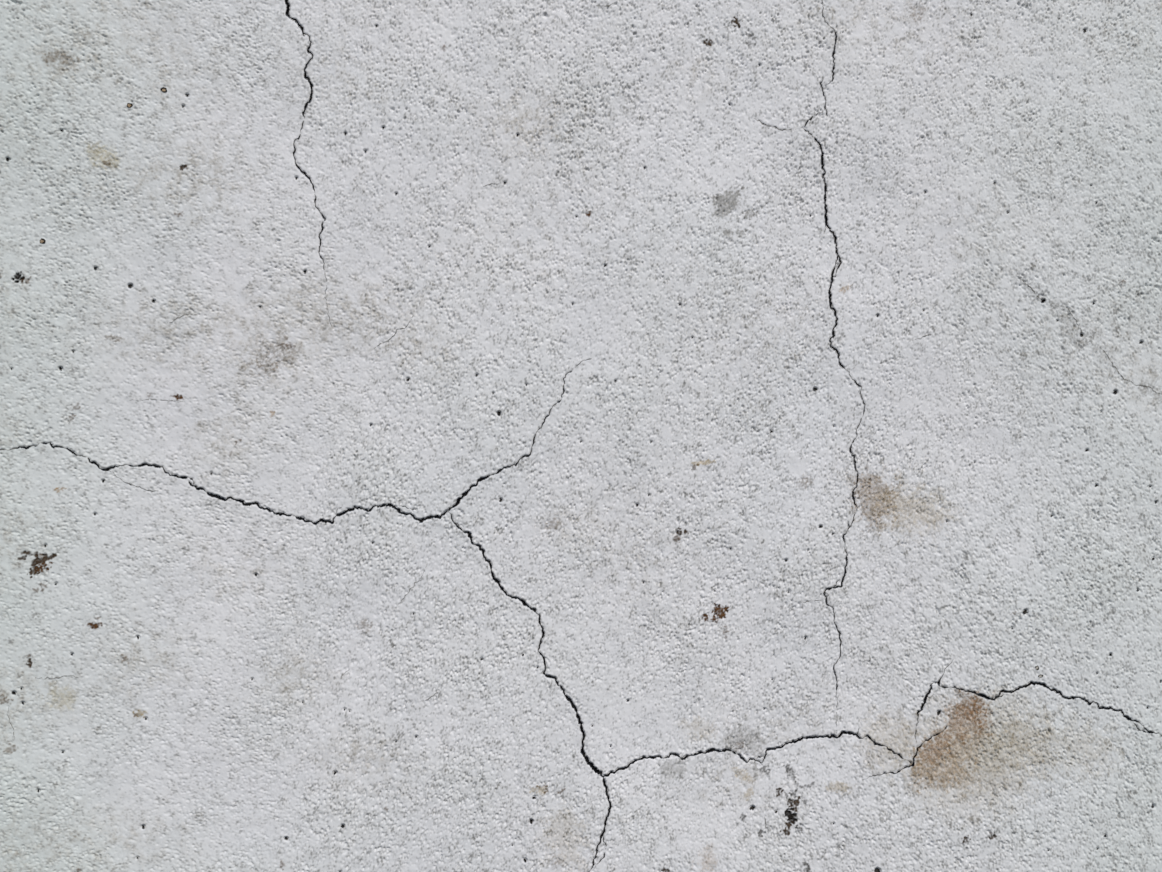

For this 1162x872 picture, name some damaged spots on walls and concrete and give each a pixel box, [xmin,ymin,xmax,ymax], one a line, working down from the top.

crack [285,0,332,326]
crack [803,0,869,714]
crack [0,358,1162,872]